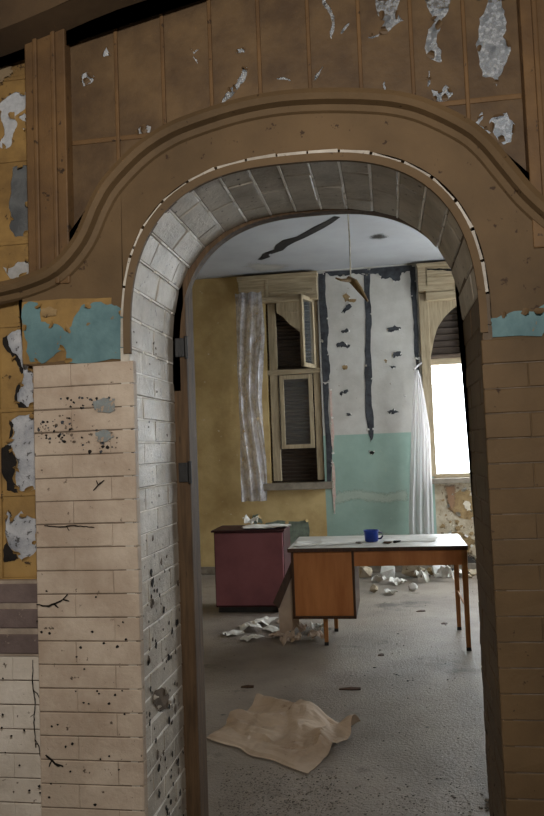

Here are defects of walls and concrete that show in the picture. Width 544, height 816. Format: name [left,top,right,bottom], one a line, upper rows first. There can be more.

peeling [0,92,26,149]
peeling [488,305,544,337]
peeling [1,298,123,493]
peeling [3,510,37,562]
flaking render [440,487,477,559]
crack [32,660,63,767]